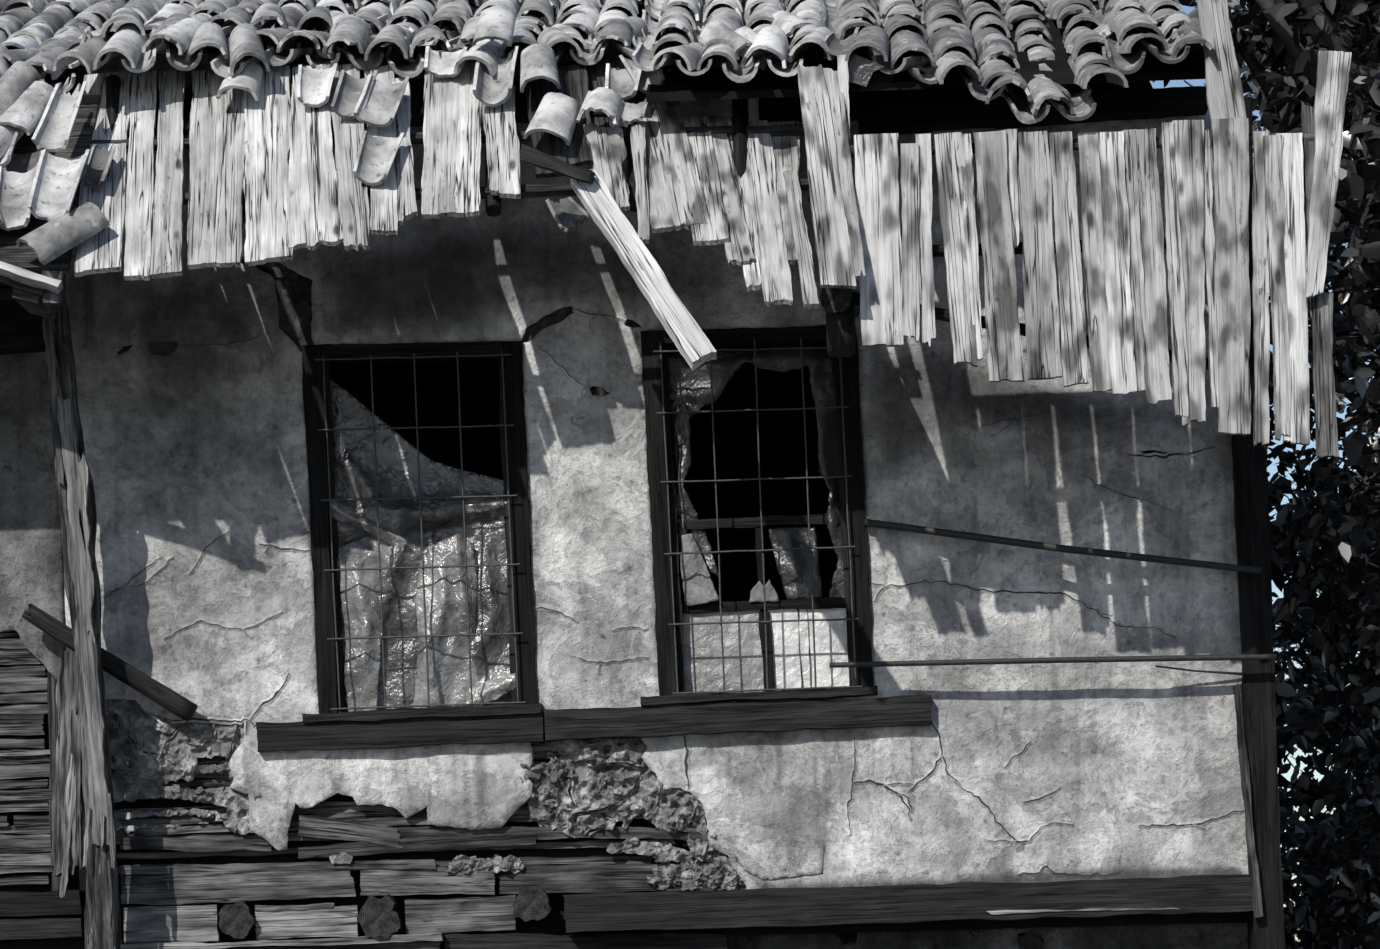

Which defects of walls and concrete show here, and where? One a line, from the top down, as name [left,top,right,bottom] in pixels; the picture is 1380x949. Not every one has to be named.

crack [1126,444,1216,461]
crack [1081,472,1170,512]
crack [103,530,310,598]
crack [162,610,284,641]
crack [871,577,1177,640]
crack [171,672,291,734]
spalling [105,699,261,835]
spalling [520,738,745,891]
crack [845,701,1106,879]
spalling [329,852,353,864]
spalling [445,854,524,875]